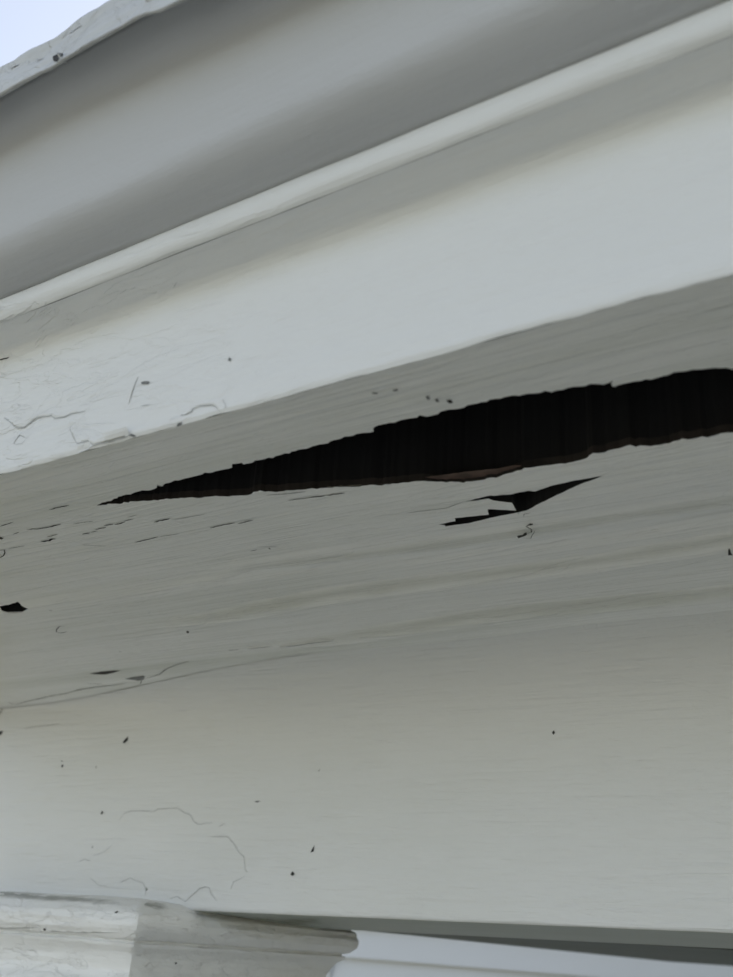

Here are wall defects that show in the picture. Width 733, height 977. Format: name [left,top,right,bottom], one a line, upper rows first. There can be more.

crack [4,407,86,429]
crack [118,805,248,902]